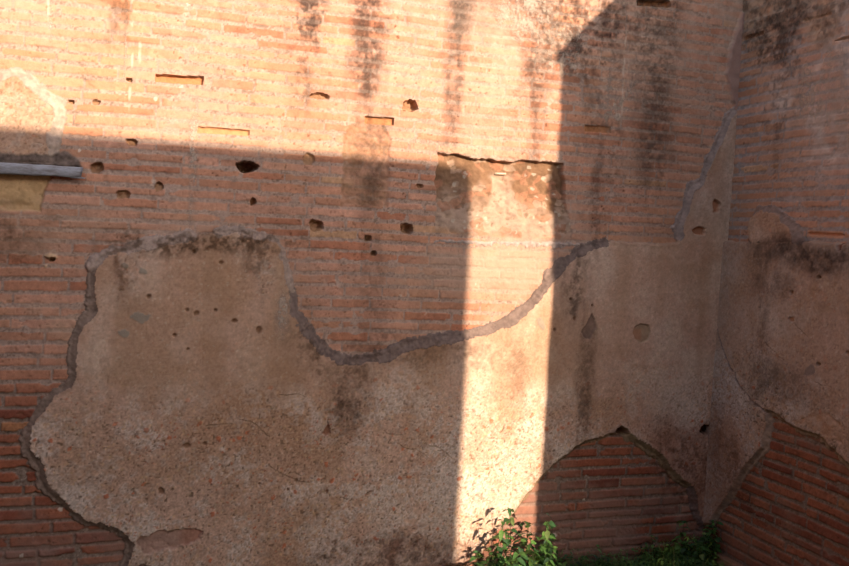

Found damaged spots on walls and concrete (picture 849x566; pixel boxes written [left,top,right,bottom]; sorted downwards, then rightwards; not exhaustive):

spalling [156,74,204,85]
damp [299,0,321,40]
damp [354,0,382,97]
damp [450,2,469,66]
damp [500,0,617,97]
spalling [0,174,51,212]
spalling [197,126,250,136]
spalling [340,116,394,209]
spalling [434,152,573,242]
damp [773,237,848,272]
spalling [478,431,703,566]
flaking render [135,527,204,566]